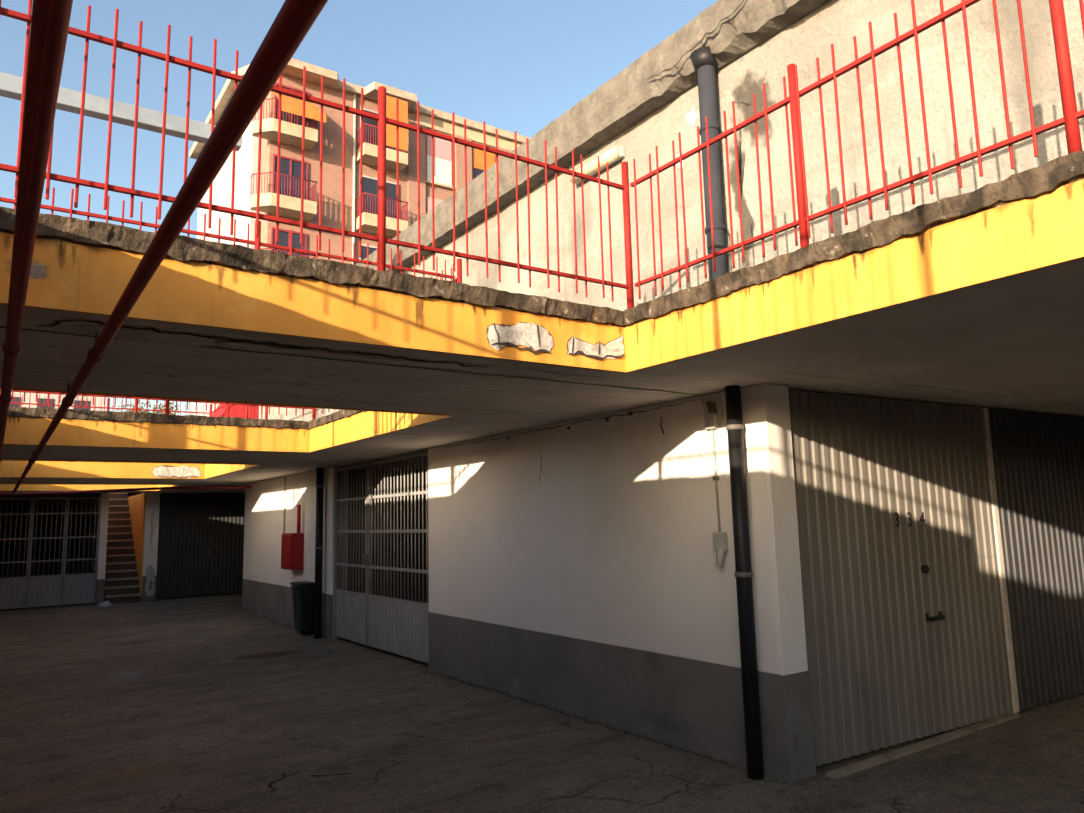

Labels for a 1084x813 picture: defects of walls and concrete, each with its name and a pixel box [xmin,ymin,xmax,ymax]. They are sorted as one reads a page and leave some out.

water stain [734,75,771,139]
water stain [730,144,754,267]
crack [37,320,488,368]
peeling [486,322,624,378]